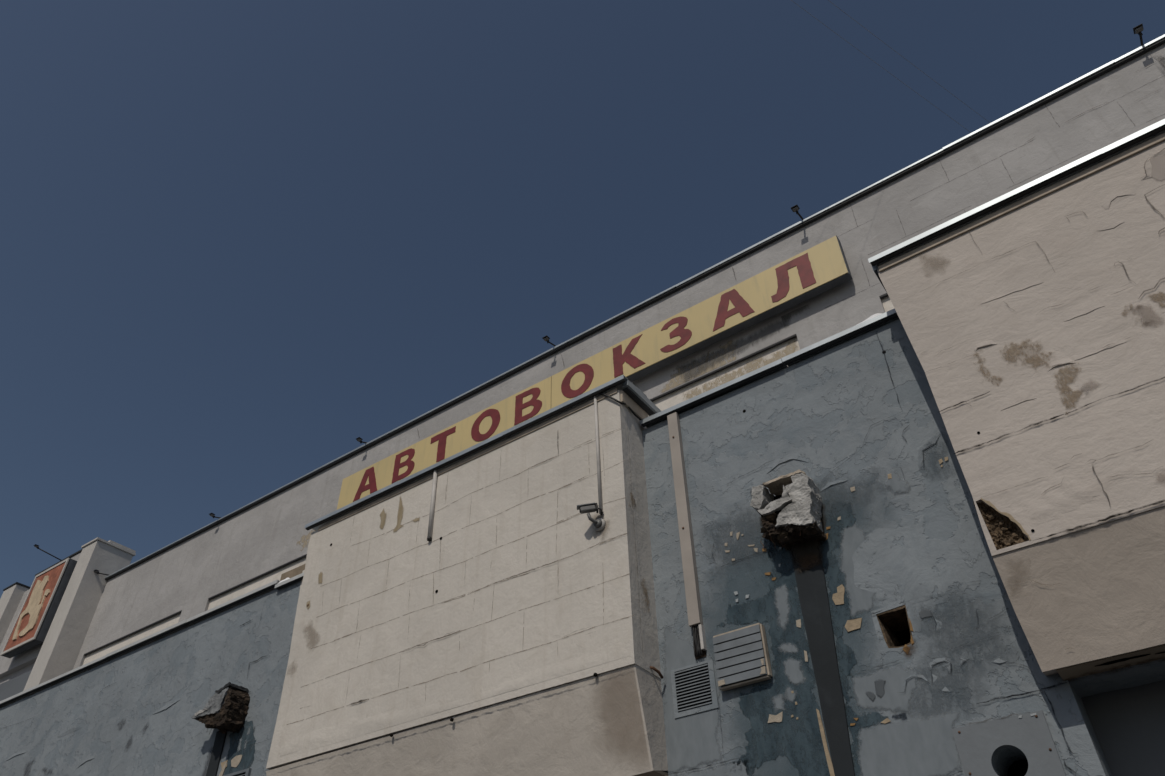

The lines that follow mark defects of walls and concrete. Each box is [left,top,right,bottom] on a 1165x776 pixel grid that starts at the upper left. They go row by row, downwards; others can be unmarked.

peeling [1097,148,1165,231]
peeling [1123,292,1165,326]
peeling [662,319,797,398]
crack [954,377,1165,454]
spalling [973,498,1031,550]
peeling [663,512,830,776]